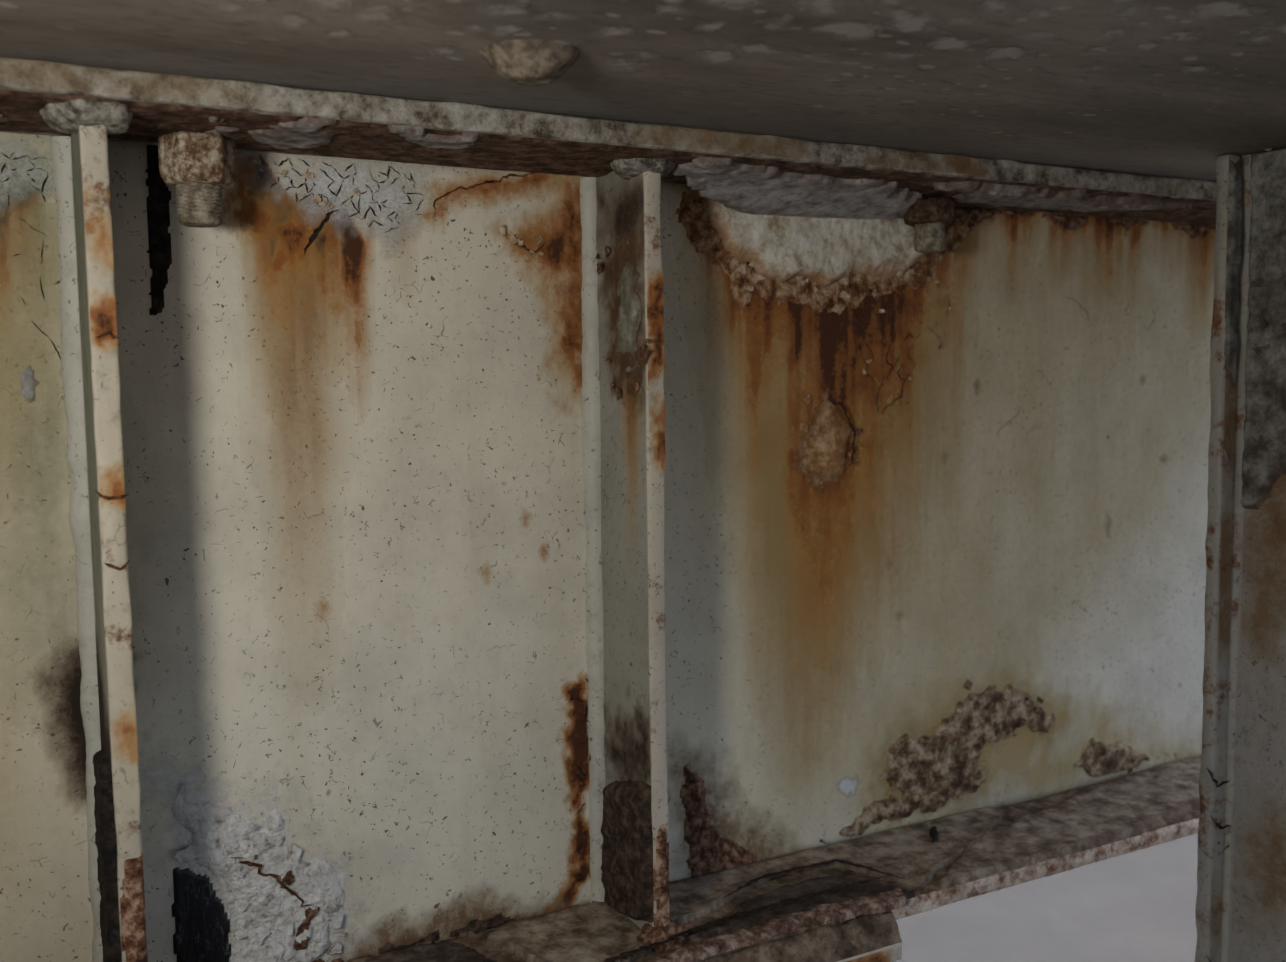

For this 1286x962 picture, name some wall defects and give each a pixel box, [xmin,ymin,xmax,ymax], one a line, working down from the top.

spalling [671,157,1194,315]
corrosion [0,89,1216,687]
peeling [150,767,375,962]
corrosion [311,676,1202,962]
spalling [929,826,939,843]